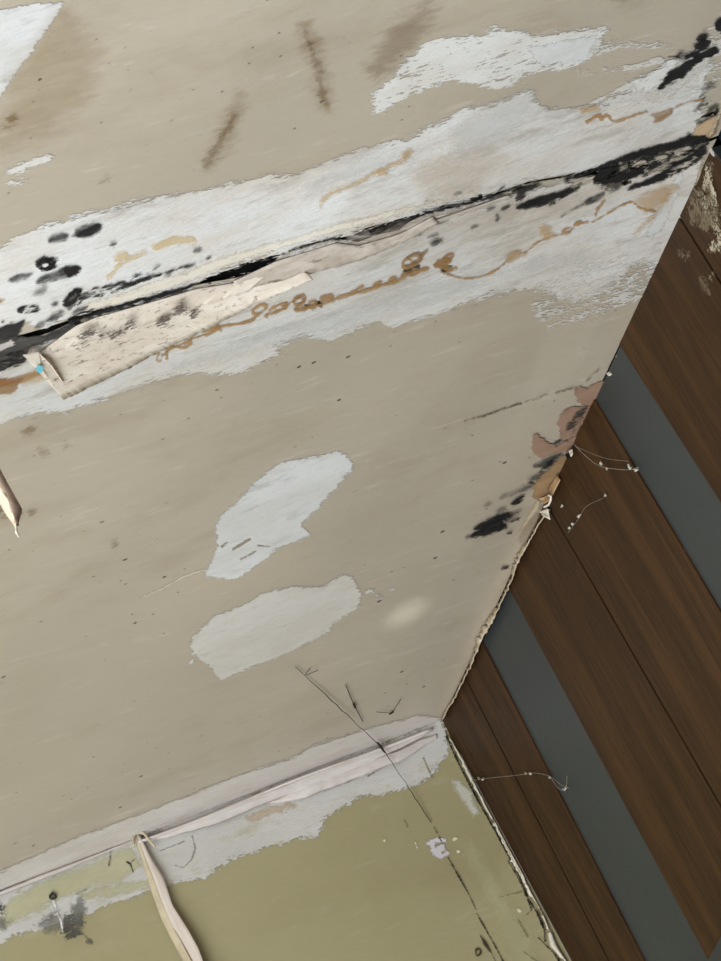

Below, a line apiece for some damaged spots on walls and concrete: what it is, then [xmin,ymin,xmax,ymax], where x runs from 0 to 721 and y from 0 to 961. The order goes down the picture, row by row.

mould [658,18,721,90]
peeling [686,111,721,138]
crack [234,173,582,287]
crack [72,282,211,322]
peeling [531,372,612,520]